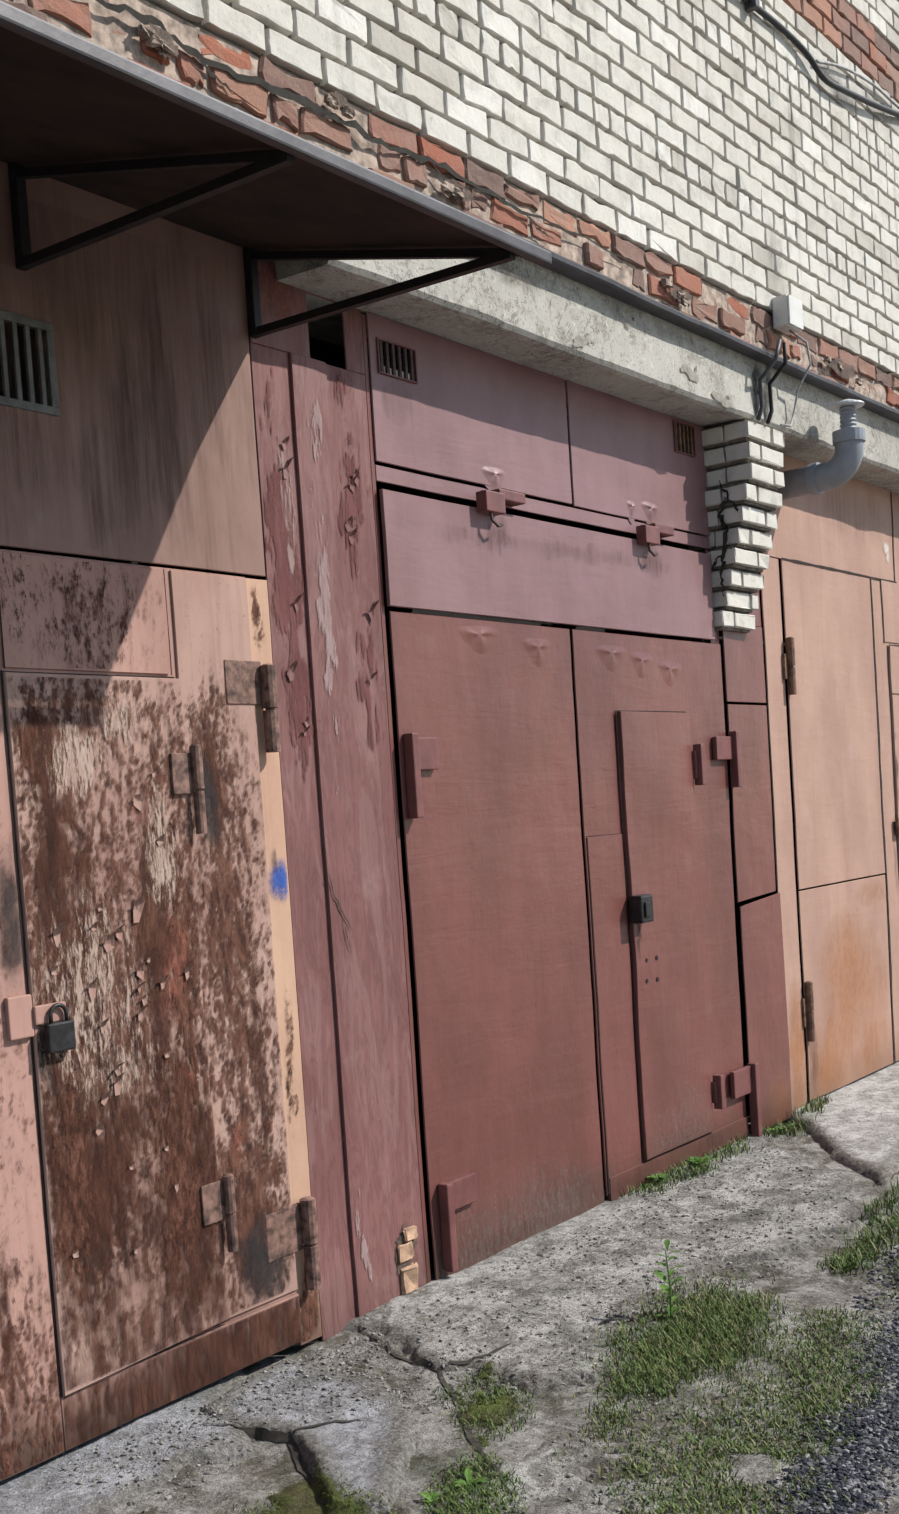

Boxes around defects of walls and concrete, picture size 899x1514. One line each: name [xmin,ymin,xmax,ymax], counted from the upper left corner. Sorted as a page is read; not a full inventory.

rust [0,555,147,669]
rust [0,675,319,1477]
crack [203,1418,369,1506]
crack [359,1324,513,1493]